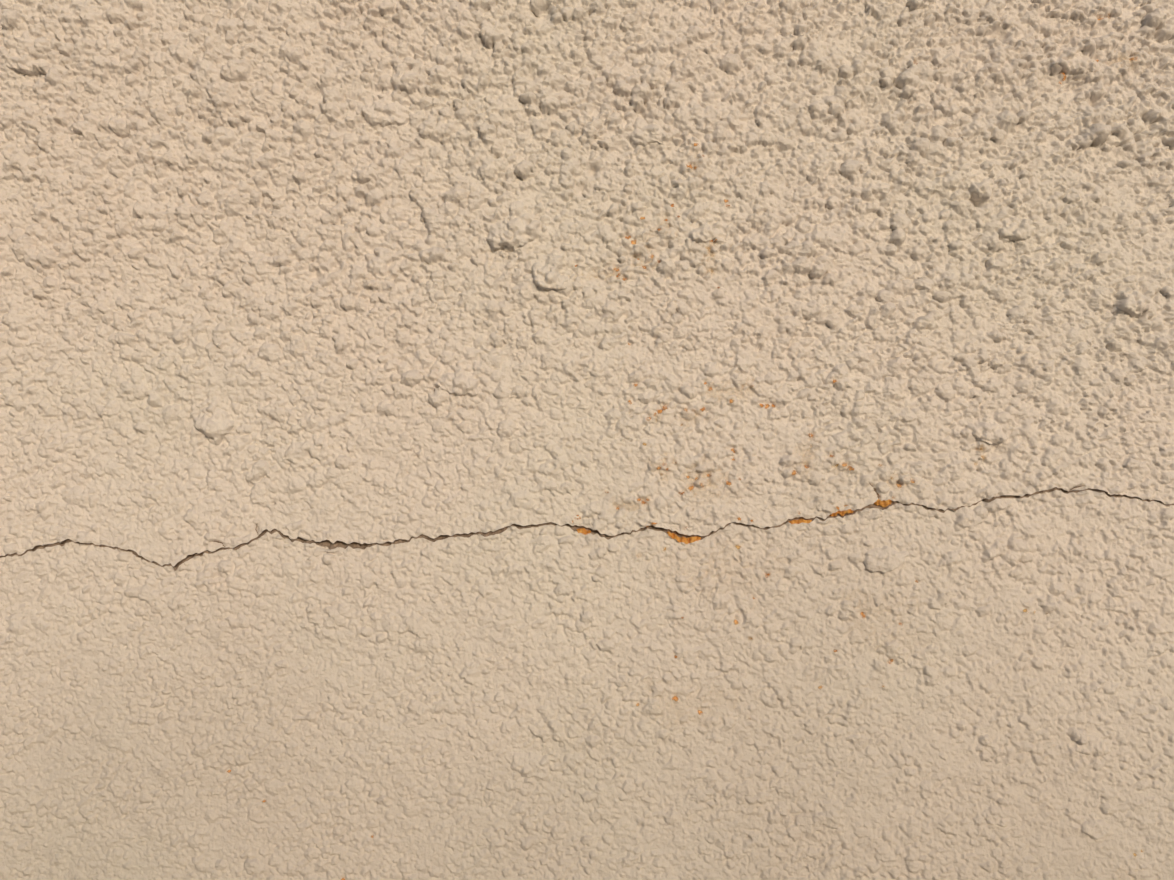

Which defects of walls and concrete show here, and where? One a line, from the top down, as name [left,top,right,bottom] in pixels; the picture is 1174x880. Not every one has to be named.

crack [0,484,1174,570]
rust [652,522,701,550]